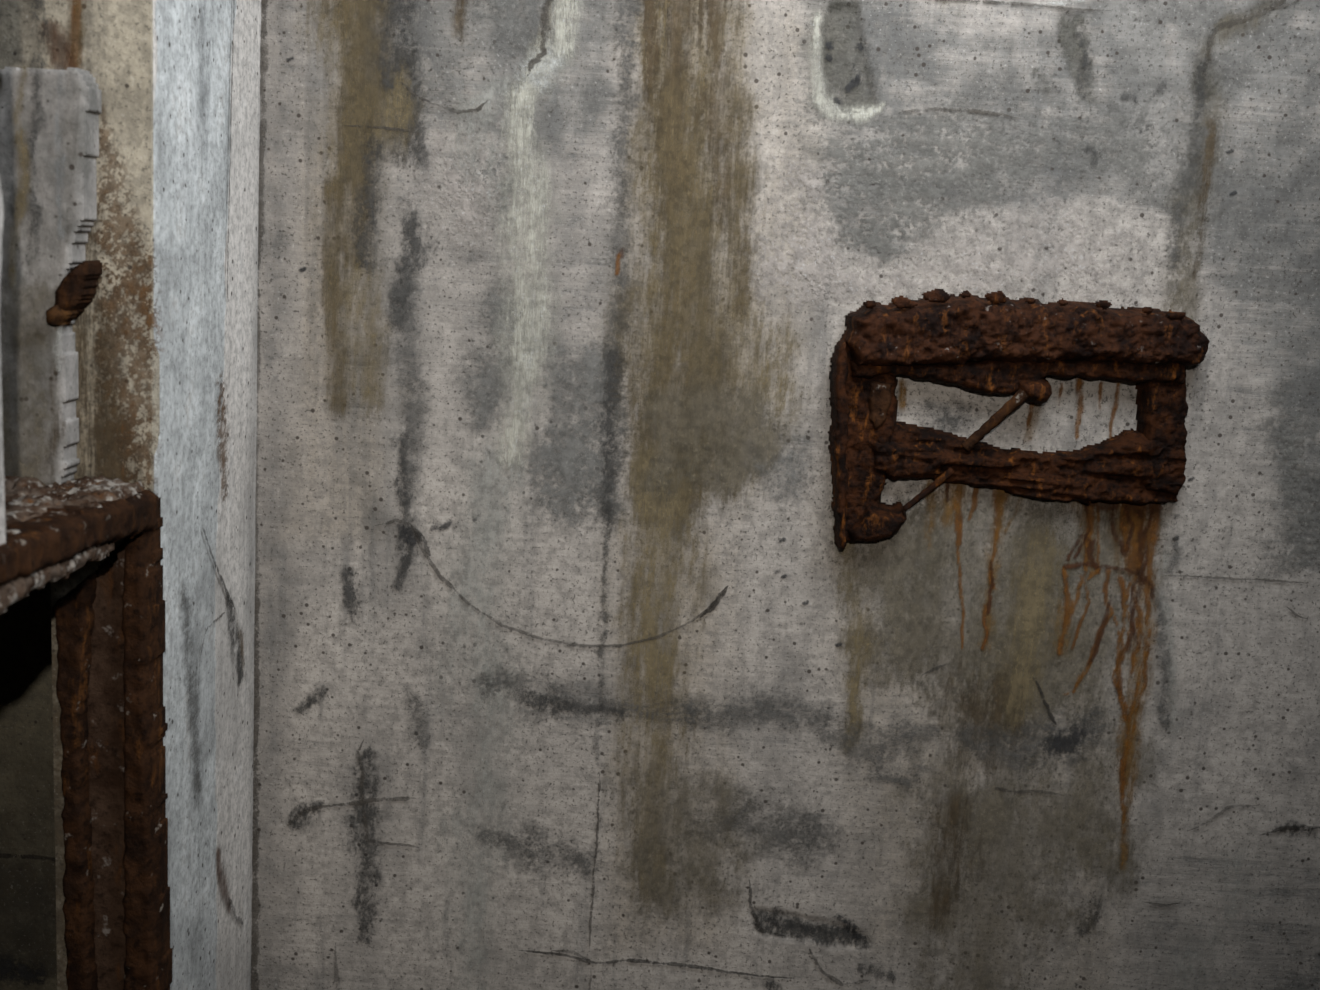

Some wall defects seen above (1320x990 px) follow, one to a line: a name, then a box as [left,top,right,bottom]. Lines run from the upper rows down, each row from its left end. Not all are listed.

crack [1208,0,1298,47]
rust [74,175,159,490]
crack [227,0,268,425]
water stain [318,0,427,413]
water stain [395,363,424,591]
water stain [451,0,1147,990]
rust [863,288,1007,310]
rust [1094,300,1112,310]
rust [1142,307,1186,320]
crack [198,513,418,990]
crack [519,780,794,979]
rust [1058,501,1161,868]